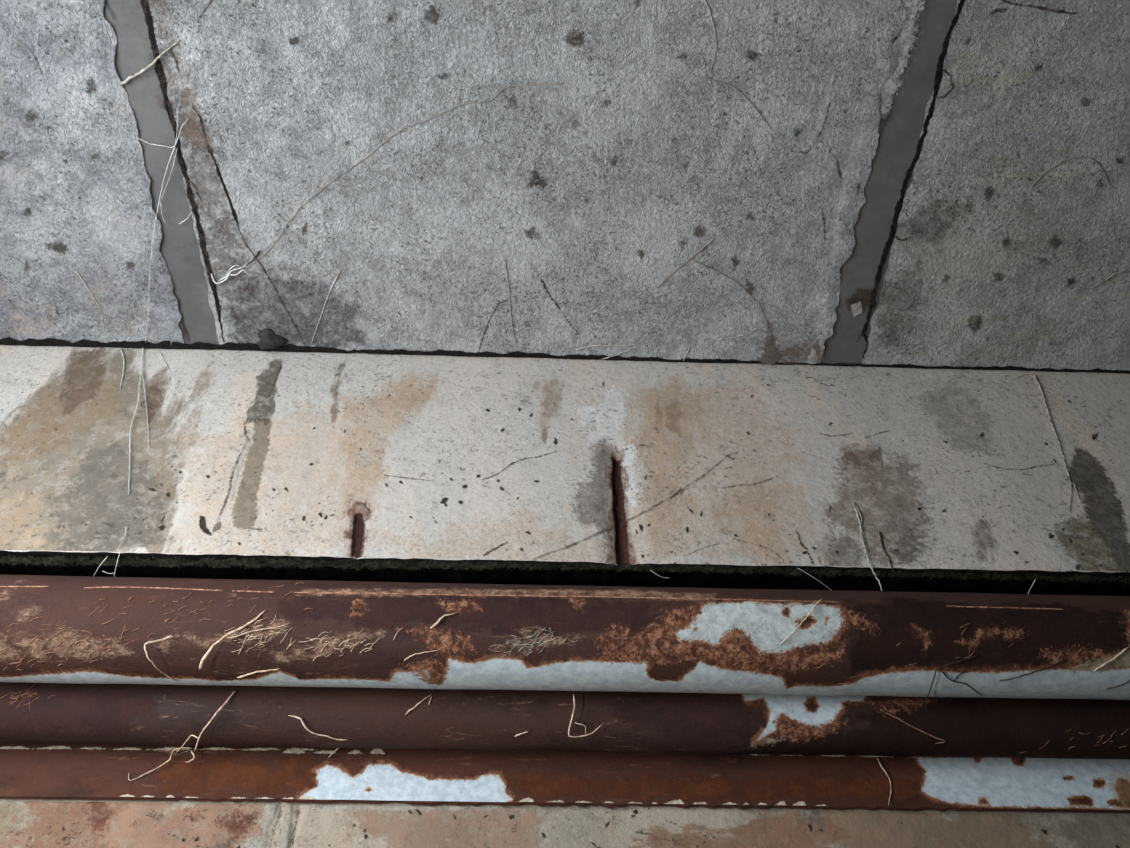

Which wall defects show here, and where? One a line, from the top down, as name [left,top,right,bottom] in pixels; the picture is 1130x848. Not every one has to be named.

crack [0,0,1130,395]
crack [219,422,251,515]
water stain [0,348,1130,583]
water stain [304,588,714,601]
water stain [0,630,129,659]
corrosion [280,593,1130,685]
peeling [0,597,1130,756]
corrosion [614,693,762,737]
corrosion [736,697,1130,759]
peeling [629,799,706,817]
peeling [912,757,1130,810]